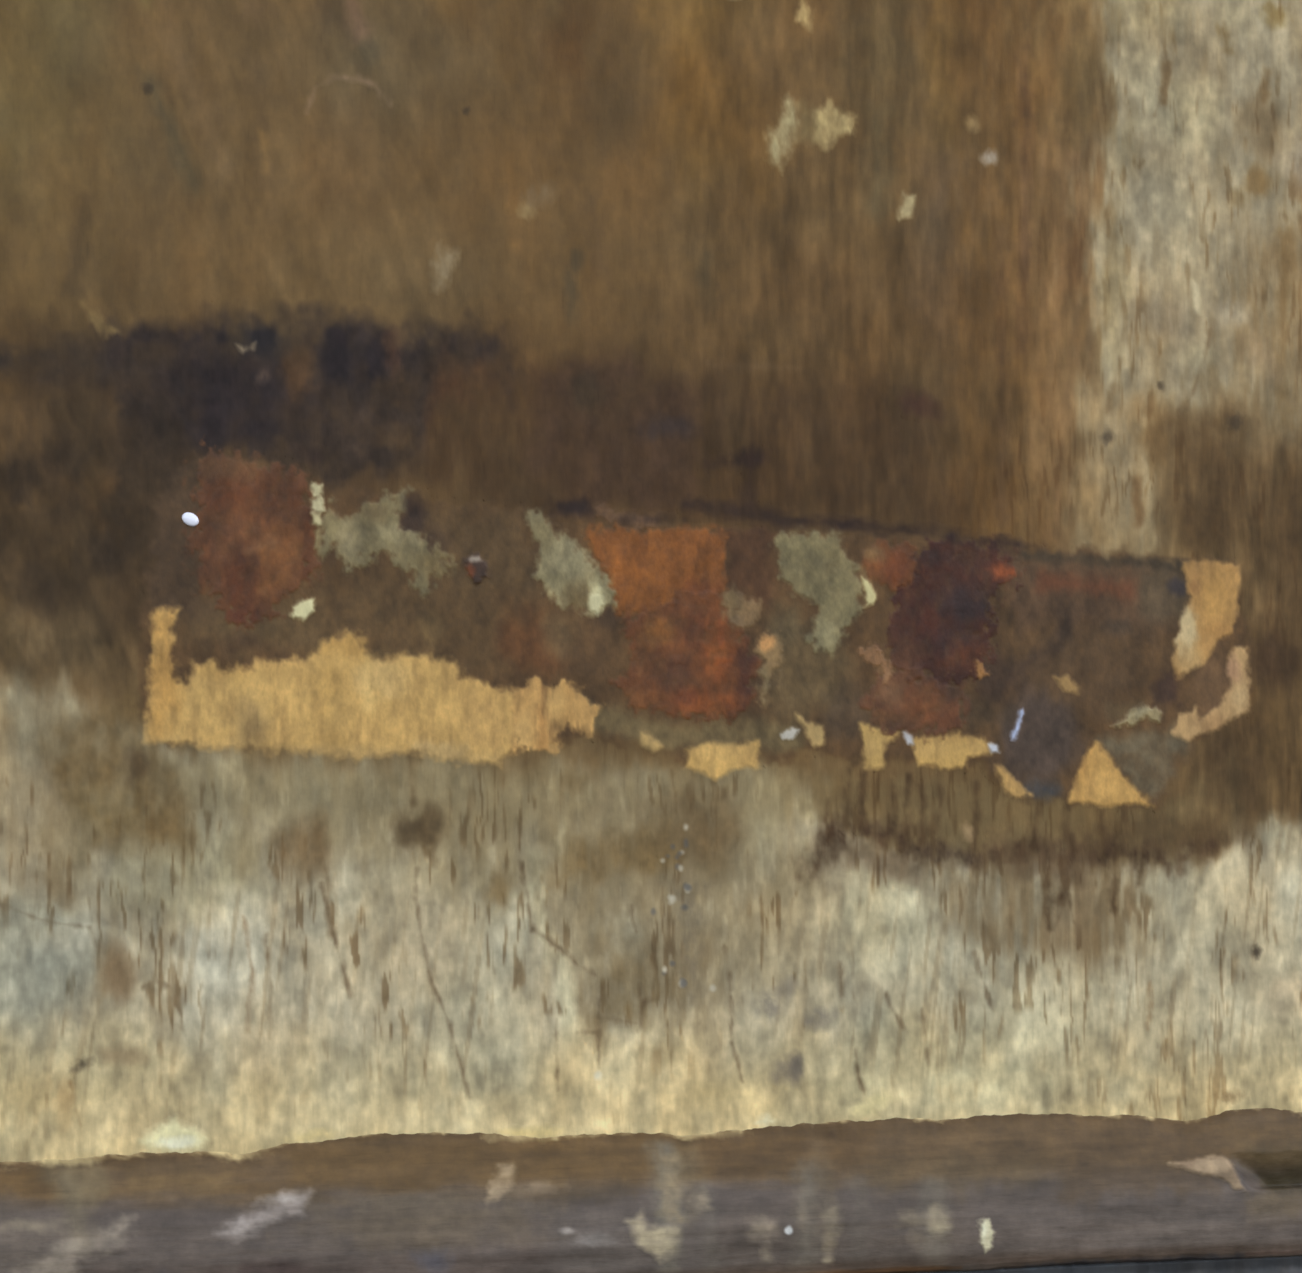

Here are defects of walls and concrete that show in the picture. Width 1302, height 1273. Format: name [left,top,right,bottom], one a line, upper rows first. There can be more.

leakage [0,284,713,650]
leakage [785,385,1302,935]
leakage [31,674,206,864]
leakage [264,803,341,941]
leakage [383,757,457,870]
leakage [482,859,518,916]
leakage [539,781,758,897]
leakage [97,930,143,1012]
leakage [93,1039,152,1073]
leakage [568,949,692,1073]
leakage [767,1048,808,1090]
leakage [741,972,843,1035]